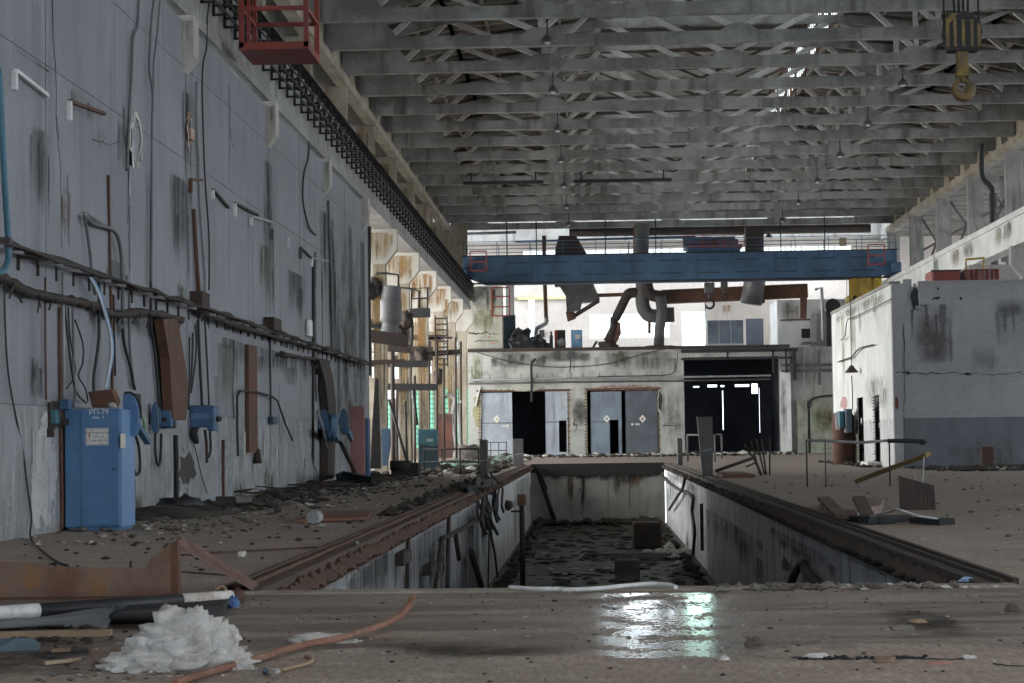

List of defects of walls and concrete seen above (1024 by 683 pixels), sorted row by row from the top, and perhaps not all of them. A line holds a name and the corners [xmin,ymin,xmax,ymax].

damp [174,176,189,274]
rust [371,233,455,371]
rust [402,318,438,401]
damp [911,305,951,359]
crack [895,298,1024,460]
spalling [179,446,198,491]